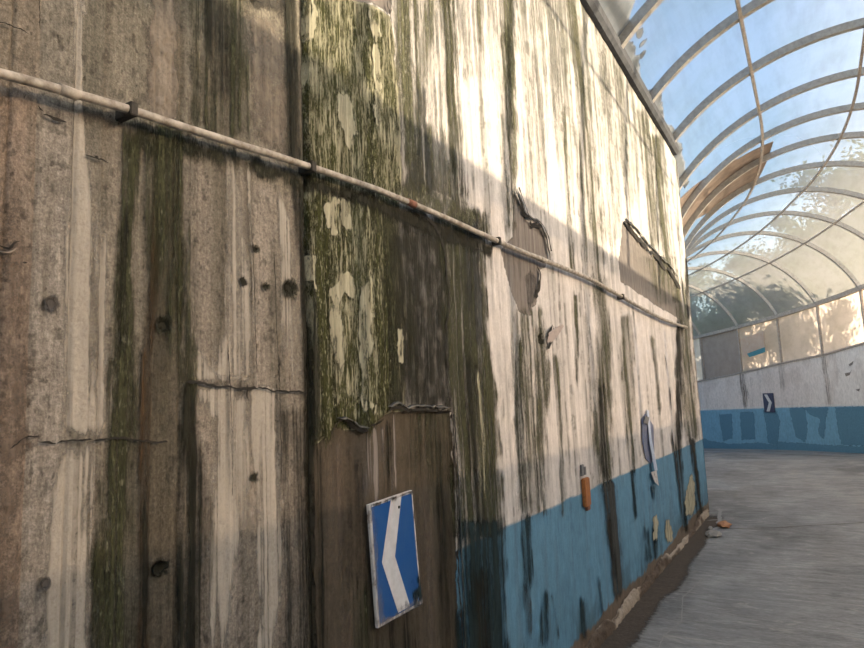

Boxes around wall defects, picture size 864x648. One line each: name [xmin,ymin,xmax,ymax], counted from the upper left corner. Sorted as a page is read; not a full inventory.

crack [0,0,41,33]
leakage [44,446,95,648]
crack [10,435,168,449]
leakage [63,0,129,435]
peeling [0,0,459,648]
crack [186,202,307,495]
leakage [129,0,671,648]
peeling [501,194,547,316]
spalling [584,474,709,648]
peeling [619,223,684,320]
leakage [599,258,718,648]